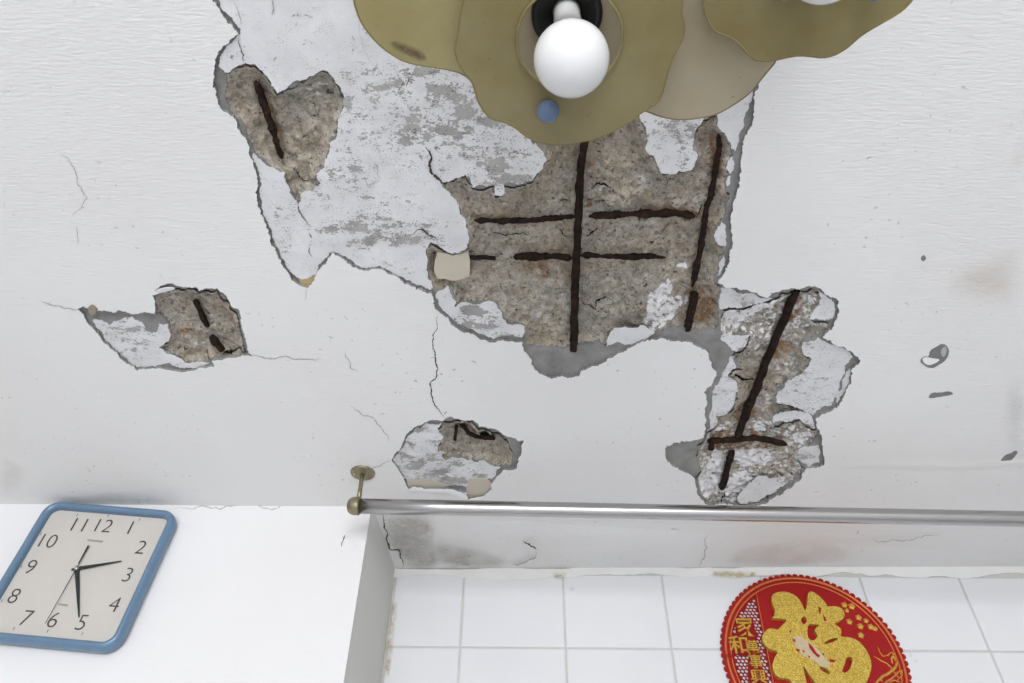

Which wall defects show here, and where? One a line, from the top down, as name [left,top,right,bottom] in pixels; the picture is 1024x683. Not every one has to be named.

peeling [214,0,859,505]
spalling [81,283,249,370]
crack [429,316,447,417]
peeling [920,344,949,368]